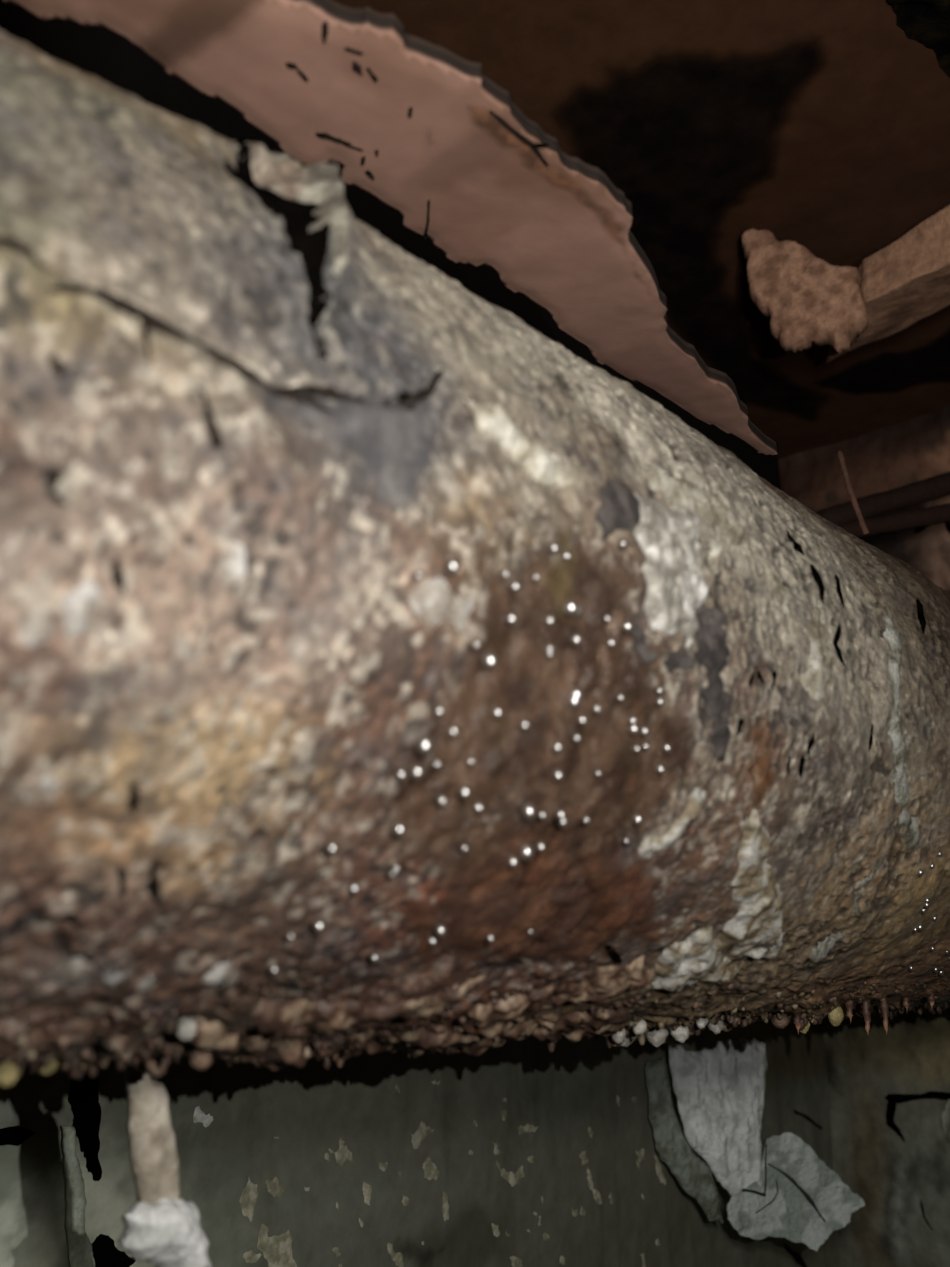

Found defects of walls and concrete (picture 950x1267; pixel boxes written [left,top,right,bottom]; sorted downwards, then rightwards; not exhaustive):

spalling [344,47,378,82]
crack [315,132,363,151]
crack [0,137,444,414]
leakage [457,390,586,487]
leakage [633,466,747,650]
leakage [394,533,707,873]
rust [414,837,655,957]
efflorescence [652,809,785,993]
peeling [239,1175,297,1267]
peeling [411,1121,449,1221]
peeling [491,1141,534,1187]
crack [885,1091,950,1142]